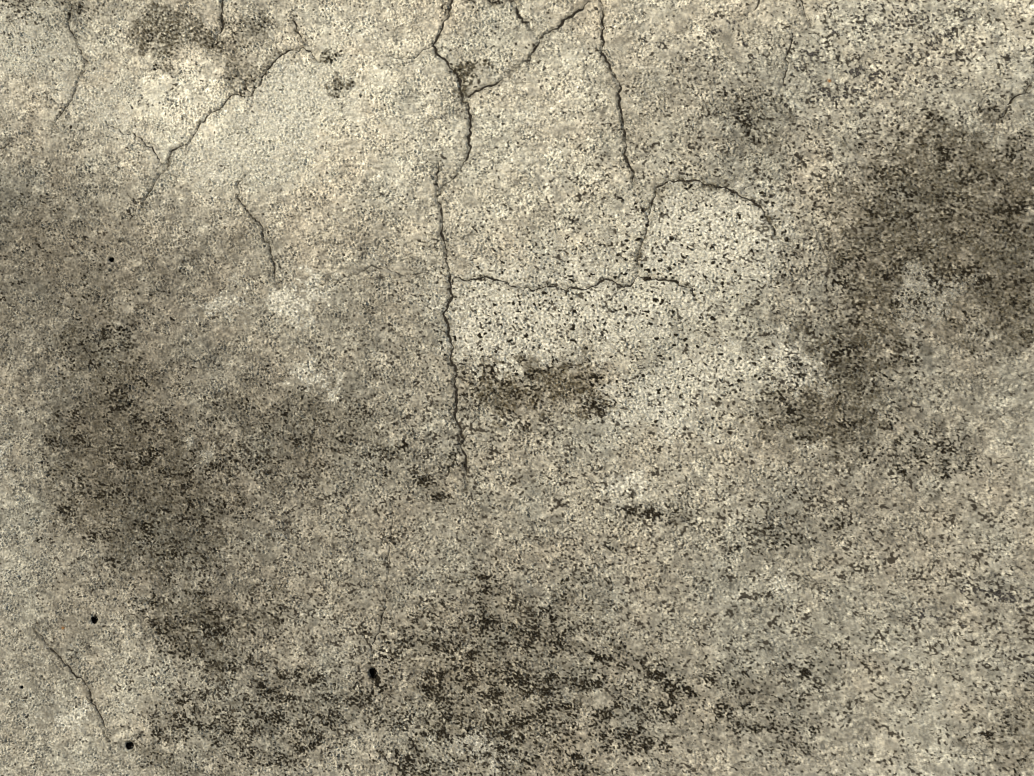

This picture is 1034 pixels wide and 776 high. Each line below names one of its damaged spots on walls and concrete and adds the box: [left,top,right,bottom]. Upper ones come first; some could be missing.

crack [57,8,87,119]
crack [111,21,315,200]
crack [217,0,225,34]
crack [995,85,1031,128]
crack [237,181,275,277]
crack [391,0,776,491]
water stain [710,0,1034,480]
water stain [0,230,872,776]